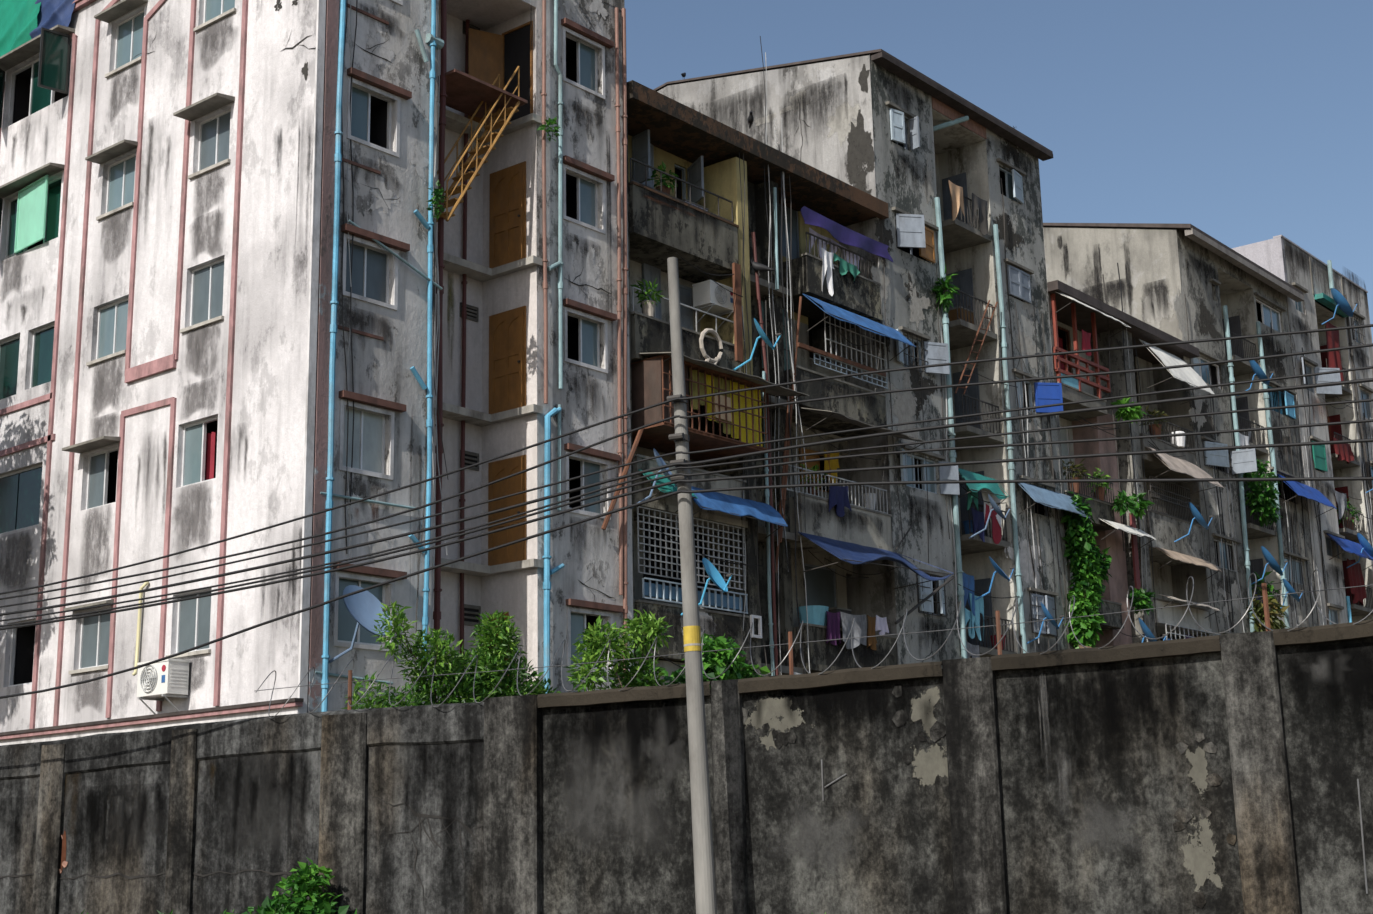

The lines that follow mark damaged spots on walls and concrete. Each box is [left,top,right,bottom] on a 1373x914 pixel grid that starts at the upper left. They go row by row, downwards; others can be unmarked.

damp [202,17,233,66]
damp [111,65,137,118]
damp [715,78,847,143]
damp [146,126,169,197]
damp [1083,250,1167,312]
damp [1198,299,1220,344]
damp [175,486,208,545]
damp [83,508,109,591]
peeling [742,692,815,751]
peeling [892,677,949,798]
damp [1017,663,1176,770]
peeling [1173,731,1236,908]